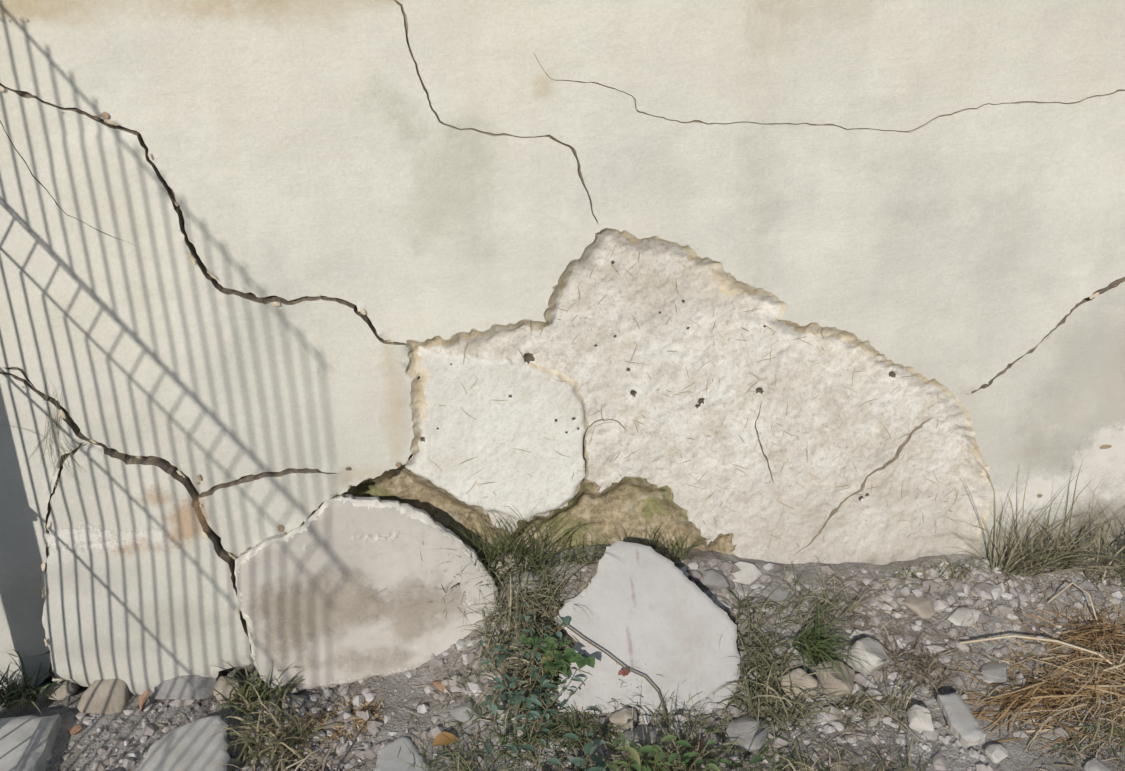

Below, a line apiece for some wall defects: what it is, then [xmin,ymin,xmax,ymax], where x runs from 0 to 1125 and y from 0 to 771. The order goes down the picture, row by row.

crack [0,83,406,345]
crack [394,0,598,223]
crack [533,52,1125,133]
crack [0,367,349,653]
spalling [395,228,992,565]
crack [796,417,933,554]
crack [971,277,1125,394]
crack [7,639,60,679]